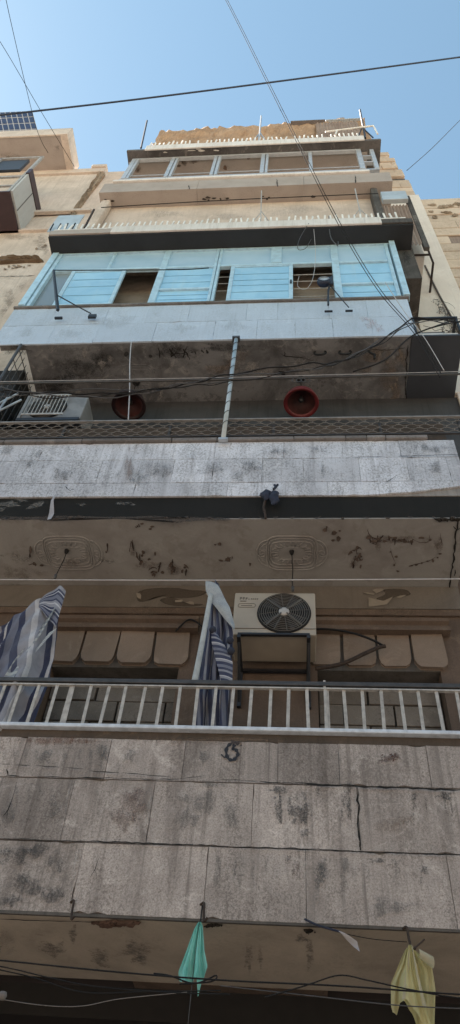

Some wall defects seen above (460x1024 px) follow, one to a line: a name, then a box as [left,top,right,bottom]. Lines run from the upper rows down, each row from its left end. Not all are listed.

crack [449,520,460,588]
crack [0,765,460,877]
leakage [270,786,319,836]
leakage [1,844,63,906]
spalling [91,920,141,929]